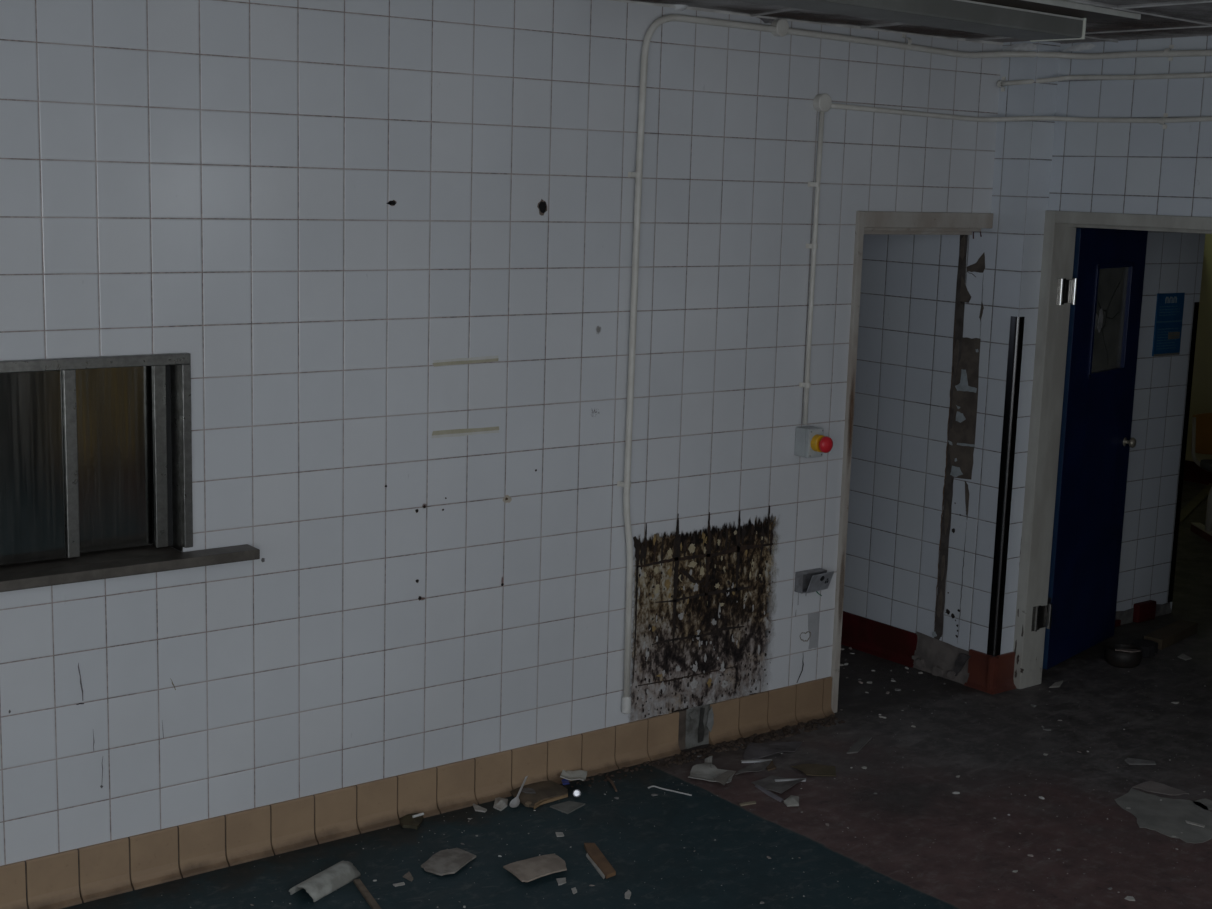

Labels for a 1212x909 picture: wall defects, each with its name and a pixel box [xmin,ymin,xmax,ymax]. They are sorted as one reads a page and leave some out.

spalling [960,253,985,321]
spalling [948,337,981,516]
damp [630,506,778,743]
peeling [913,631,971,684]